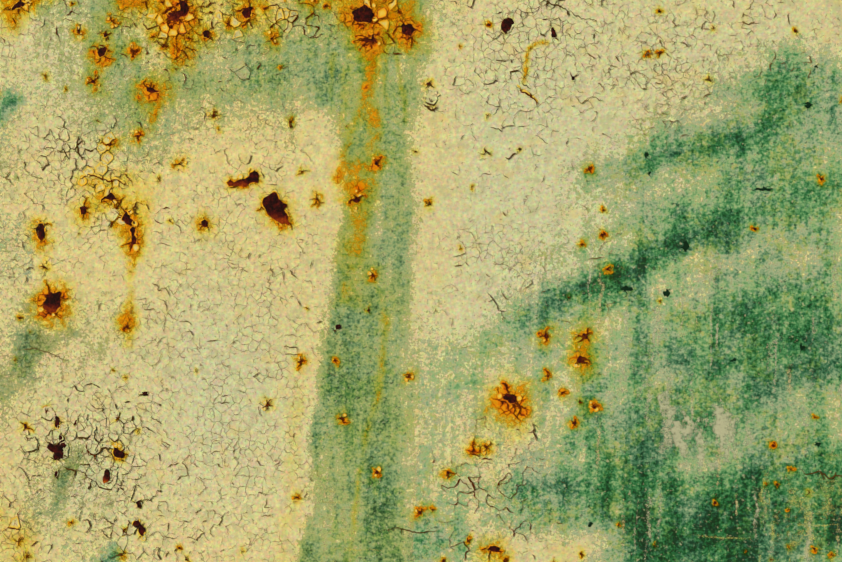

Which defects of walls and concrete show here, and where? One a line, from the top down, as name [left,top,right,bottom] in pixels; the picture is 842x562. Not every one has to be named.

rust [125,42,142,60]
rust [358,50,380,144]
crack [0,0,822,318]
rust [333,155,387,254]
crack [432,196,624,363]
rust [117,307,135,333]
crack [0,115,336,562]
rust [536,326,550,346]
rust [568,328,594,370]
peeling [38,406,56,421]
peeling [72,416,102,456]
peeling [91,463,121,492]